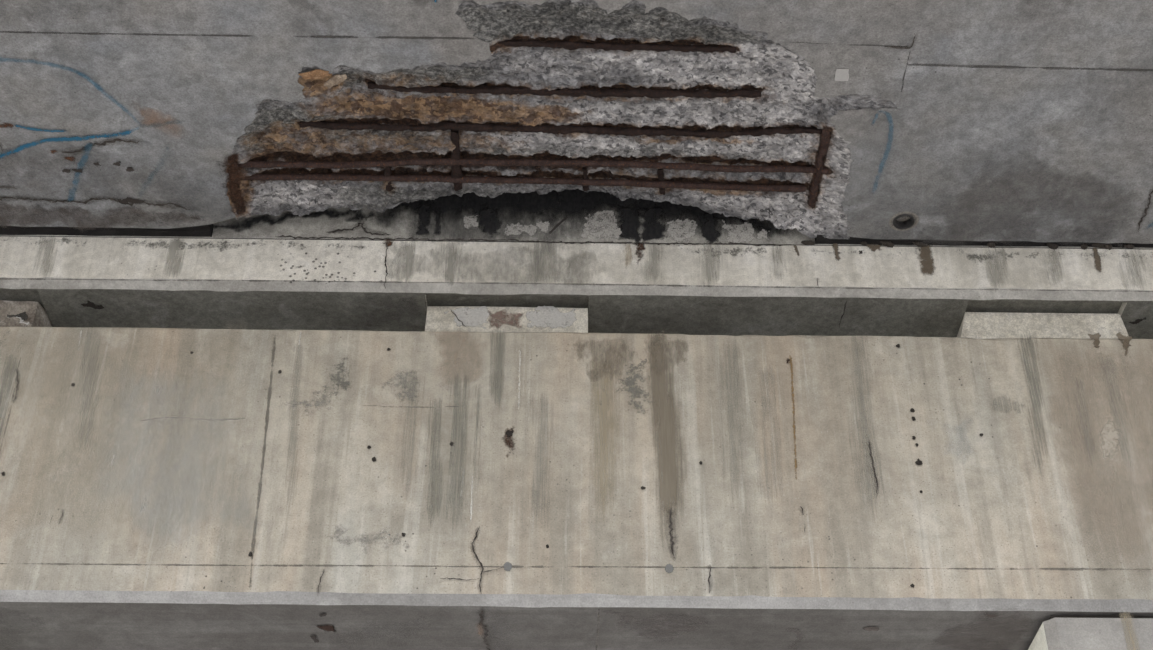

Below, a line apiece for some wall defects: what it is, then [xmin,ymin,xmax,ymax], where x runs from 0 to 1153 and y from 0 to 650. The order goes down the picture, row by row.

crack [0,138,190,210]
rust [223,155,244,212]
spalling [226,0,897,243]
crack [1138,191,1153,230]
leakage [578,335,685,520]
rust [787,358,797,479]
crack [440,526,503,650]